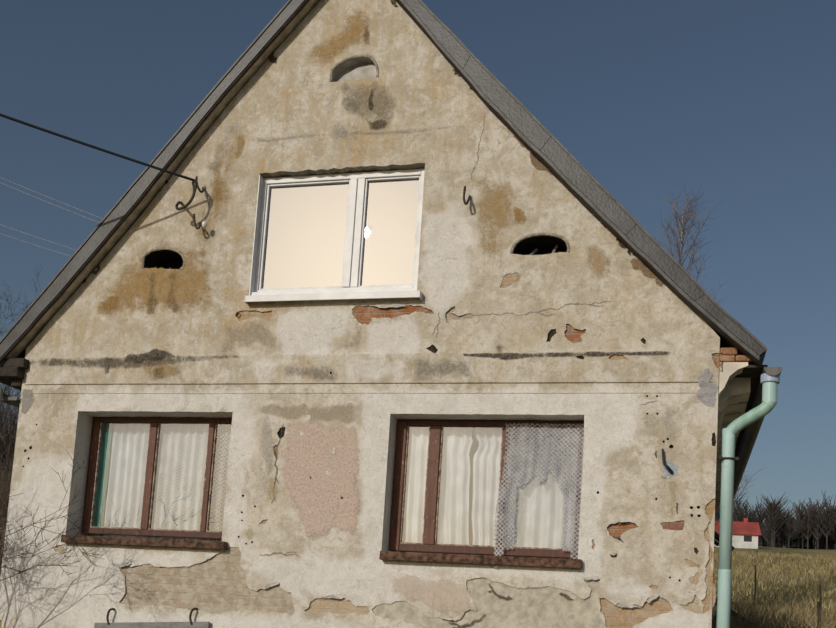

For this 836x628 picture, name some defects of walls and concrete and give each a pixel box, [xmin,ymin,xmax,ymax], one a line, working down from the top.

water stain [345,86,392,129]
spalling [500,272,520,288]
spalling [235,310,272,321]
spalling [352,303,434,325]
spalling [445,306,476,323]
crack [478,301,611,316]
spalling [546,324,586,343]
water stain [42,349,204,378]
water stain [418,351,667,374]
crack [271,423,284,503]
peeling [263,404,360,536]
spalling [117,499,716,628]